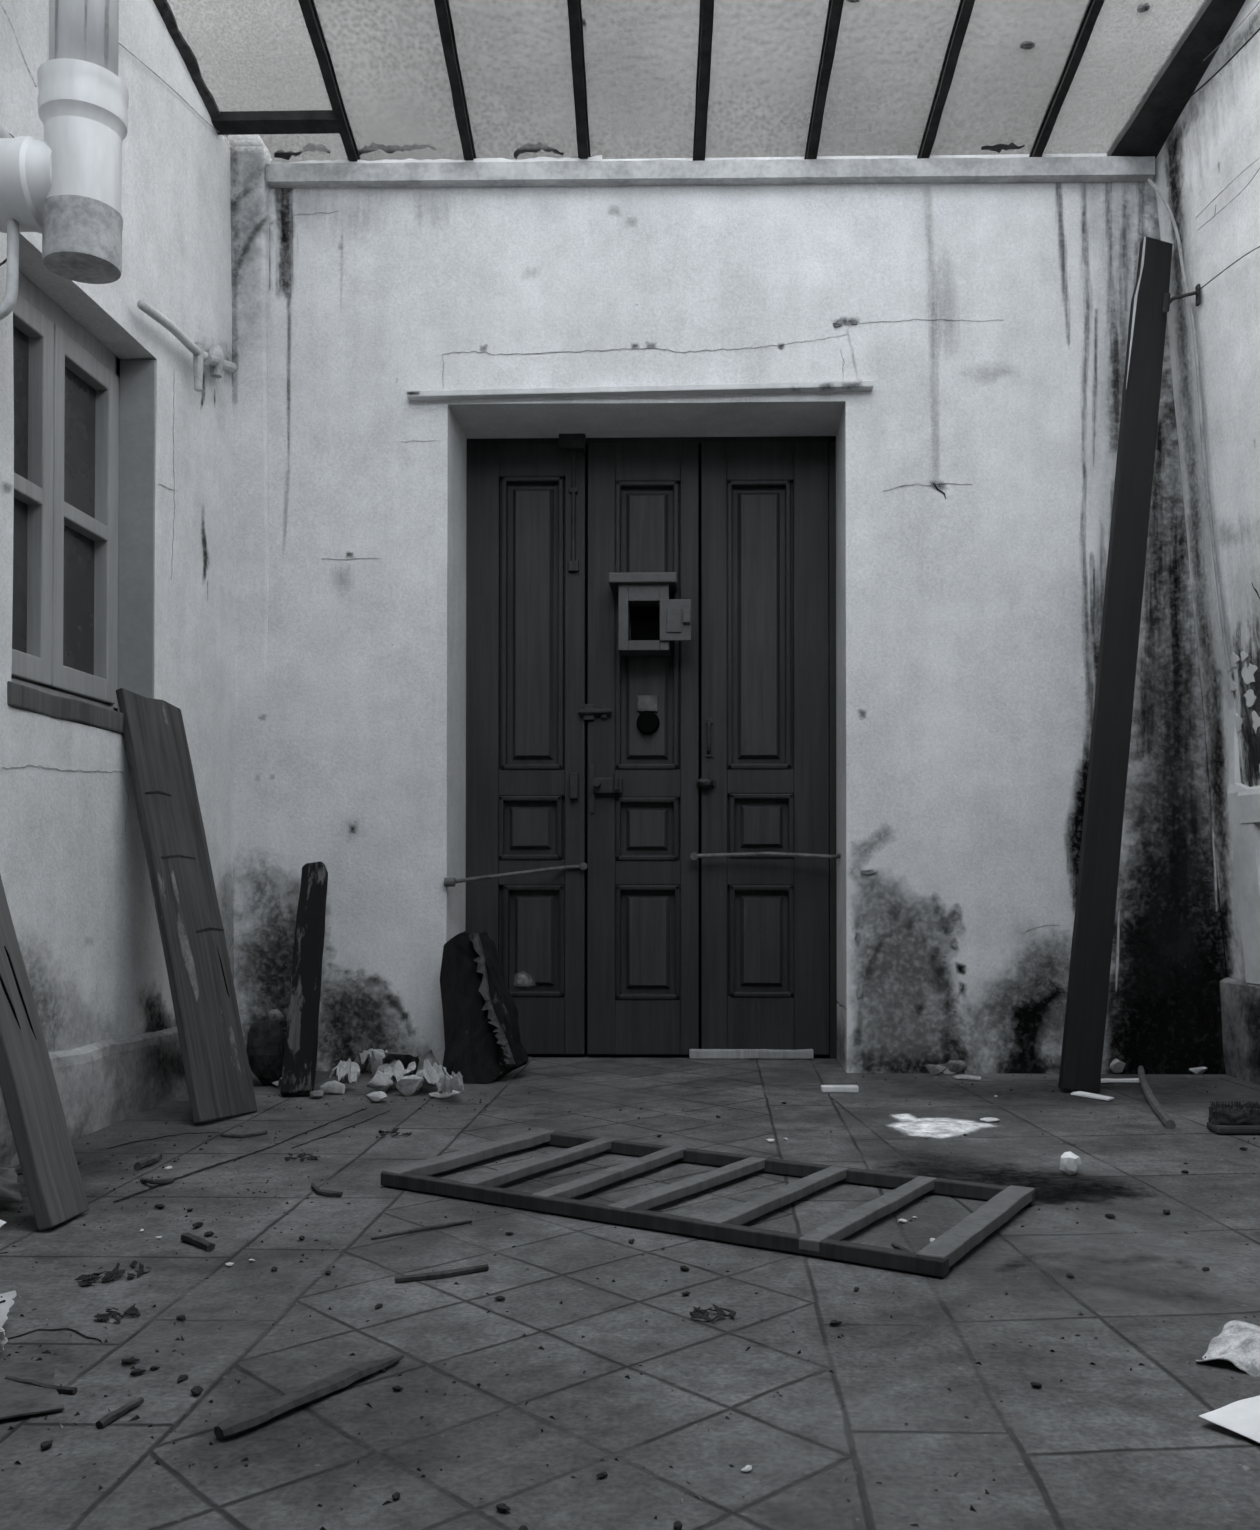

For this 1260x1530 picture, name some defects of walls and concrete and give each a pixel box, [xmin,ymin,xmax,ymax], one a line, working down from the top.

leakage [1057,186,1065,289]
leakage [1170,132,1182,241]
leakage [1084,305,1119,441]
leakage [1083,557,1104,716]
leakage [1106,408,1230,1074]
peeling [1229,624,1260,787]
leakage [1068,735,1089,906]
leakage [145,996,185,1088]
leakage [253,885,294,1032]
leakage [326,978,420,1071]
leakage [999,962,1067,1074]